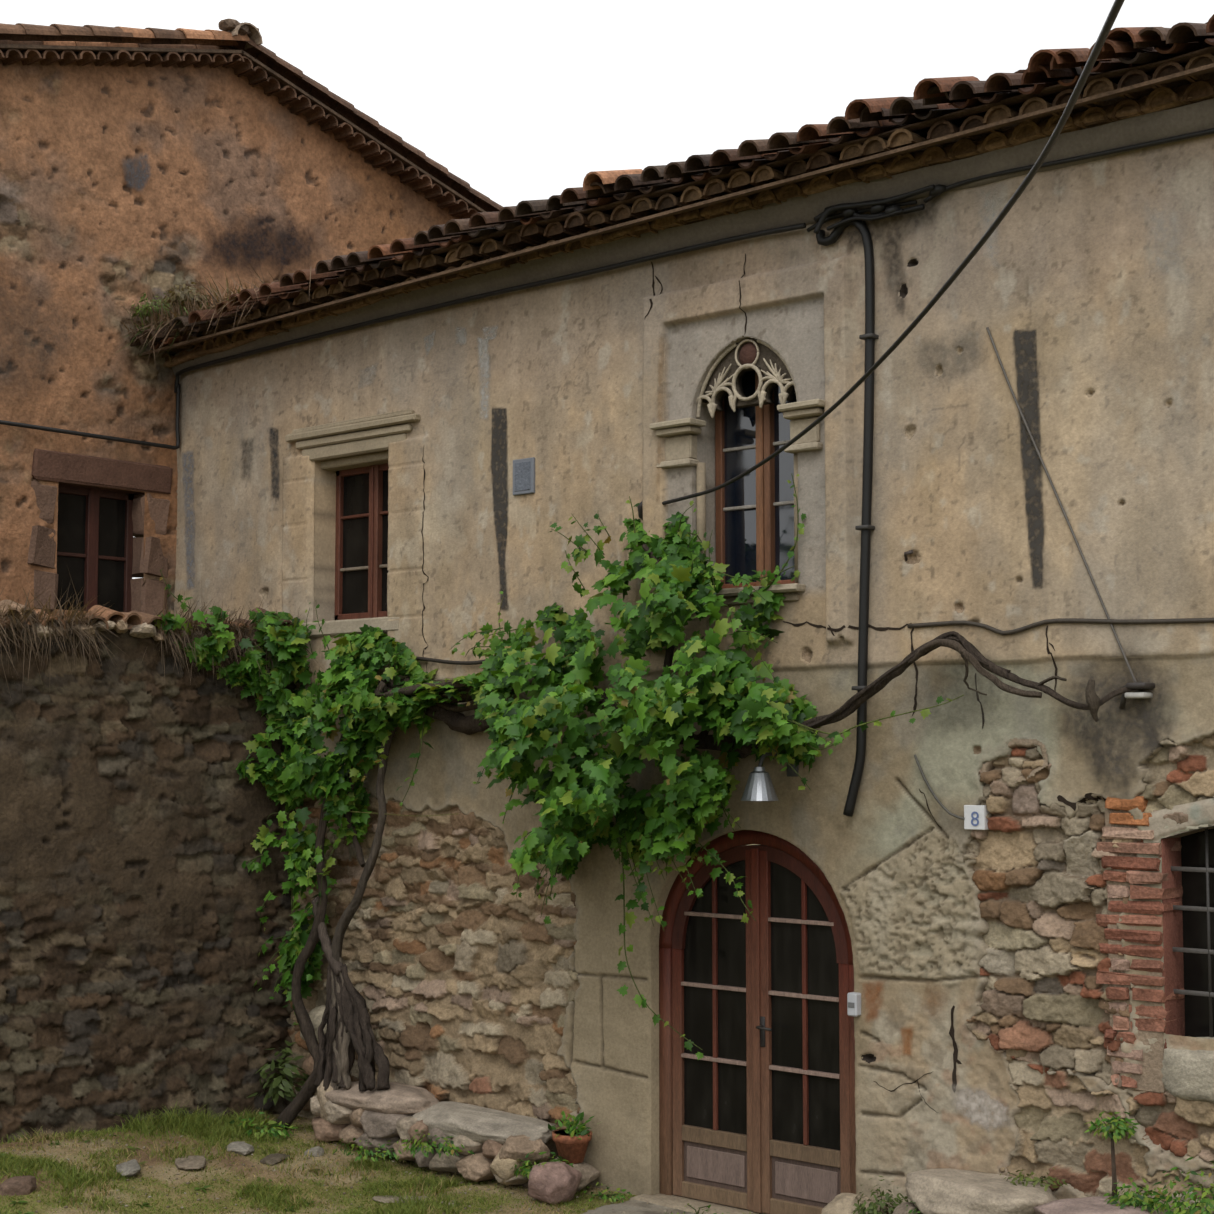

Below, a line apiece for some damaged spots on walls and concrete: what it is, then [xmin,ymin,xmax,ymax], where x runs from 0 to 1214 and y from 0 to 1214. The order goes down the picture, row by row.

leakage [206,215,312,270]
crack [644,262,663,320]
crack [739,254,747,335]
flaking render [287,788,581,1130]
flaking render [963,735,1214,1202]
crack [874,1005,962,1113]